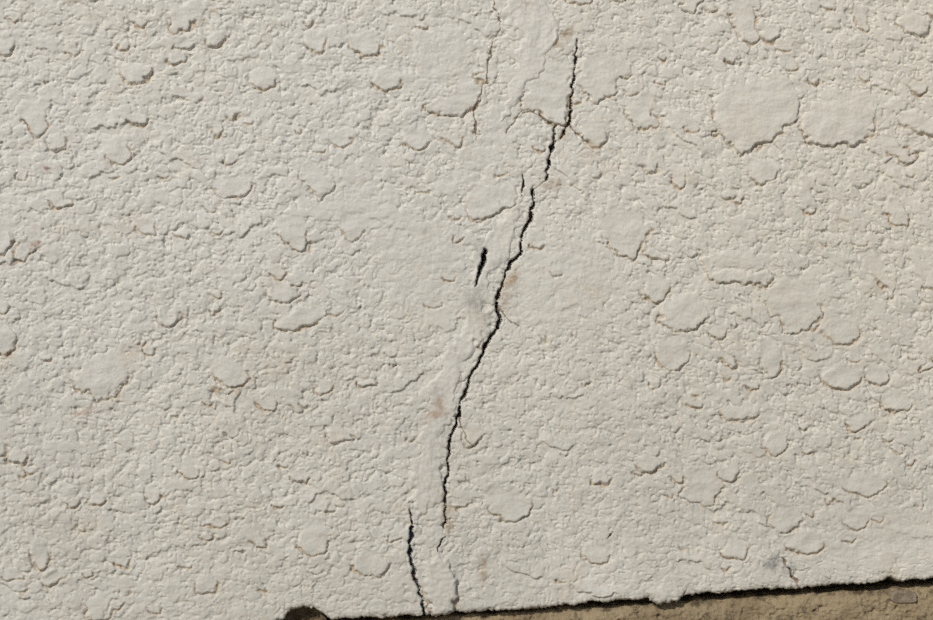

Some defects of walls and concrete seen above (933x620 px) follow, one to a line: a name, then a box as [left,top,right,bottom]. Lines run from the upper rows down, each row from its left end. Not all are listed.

crack [472,1,501,141]
crack [437,40,588,552]
crack [407,510,426,614]